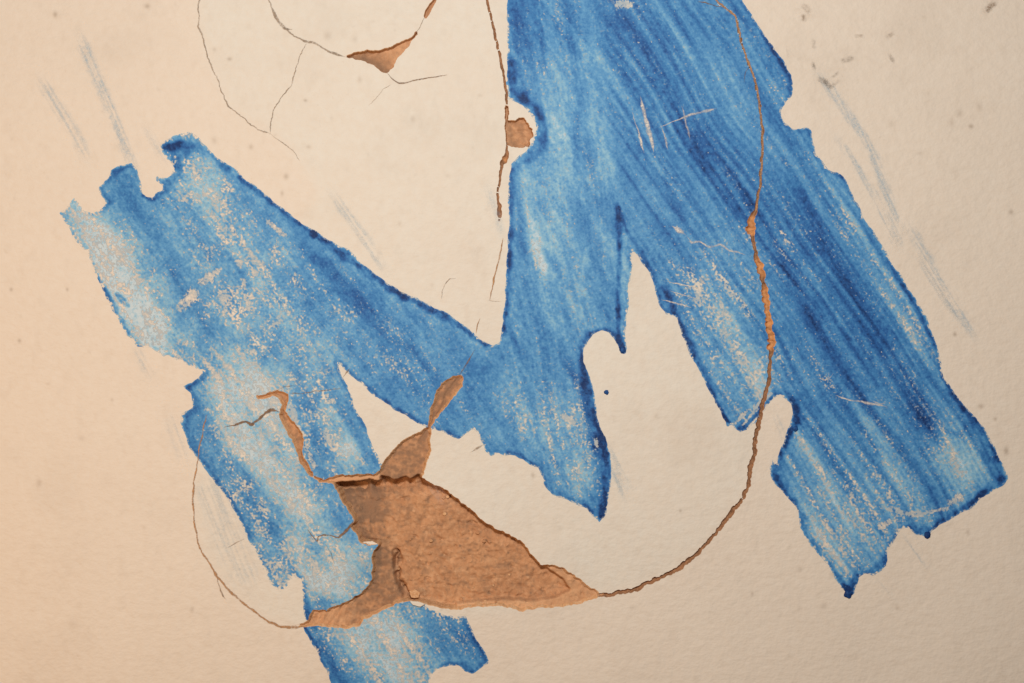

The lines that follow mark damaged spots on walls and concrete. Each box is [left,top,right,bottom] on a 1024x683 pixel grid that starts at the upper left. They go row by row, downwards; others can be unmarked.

crack [197,1,342,156]
spalling [346,31,418,73]
crack [486,0,508,104]
spalling [504,105,534,148]
crack [490,144,509,297]
crack [599,0,776,597]
crack [192,390,325,629]
spalling [256,375,604,629]